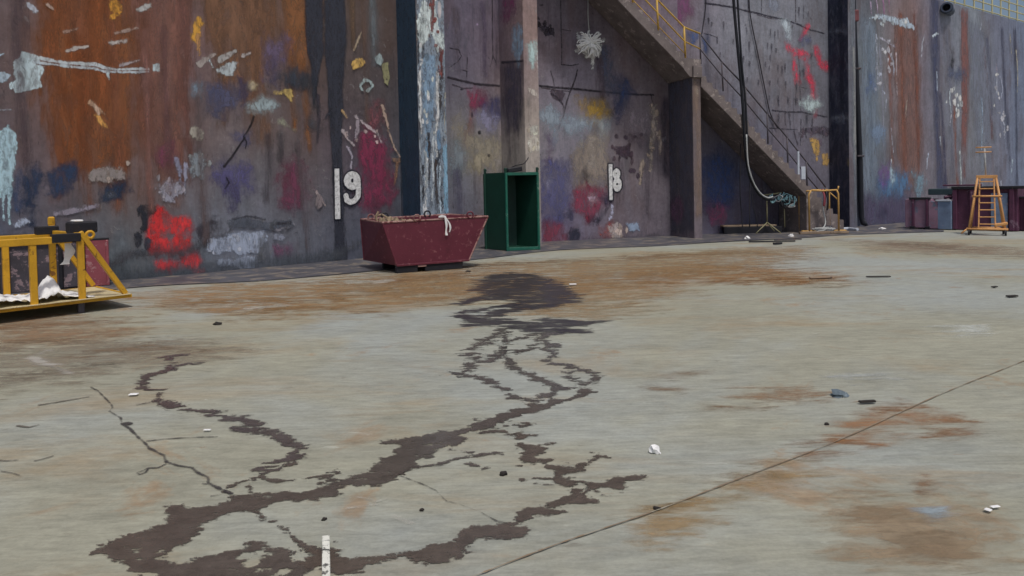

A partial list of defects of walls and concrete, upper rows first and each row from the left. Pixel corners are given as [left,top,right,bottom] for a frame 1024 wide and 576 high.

rust [37,0,191,203]
rust [204,0,308,145]
peeling [416,0,449,215]
rust [888,13,922,190]
rust [953,11,970,152]
crack [16,387,233,496]
leakage [89,272,646,576]
rust [833,407,975,446]